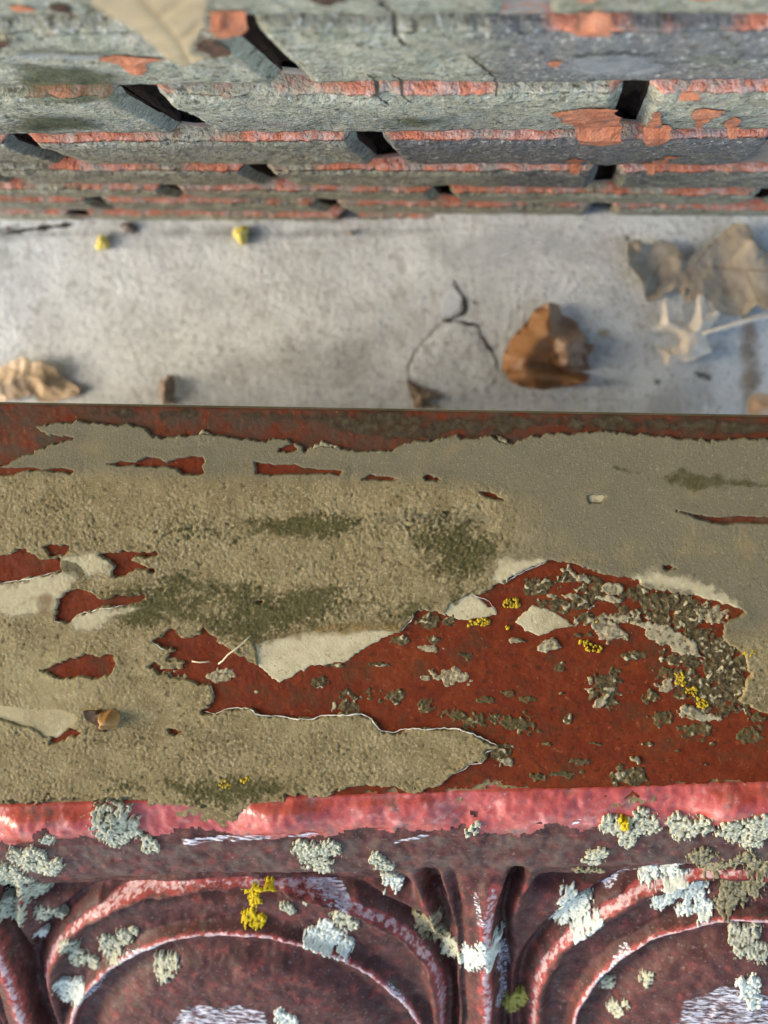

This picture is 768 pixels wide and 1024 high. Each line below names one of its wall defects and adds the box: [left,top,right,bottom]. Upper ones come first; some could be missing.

spalling [49,4,74,21]
spalling [193,11,248,58]
spalling [570,0,611,37]
spalling [99,55,164,76]
spalling [550,109,623,146]
spalling [643,112,672,146]
spalling [679,92,741,139]
peeling [0,404,768,475]
peeling [685,512,768,524]
flaking render [0,544,158,631]
peeling [44,654,116,678]
peeling [150,556,768,799]